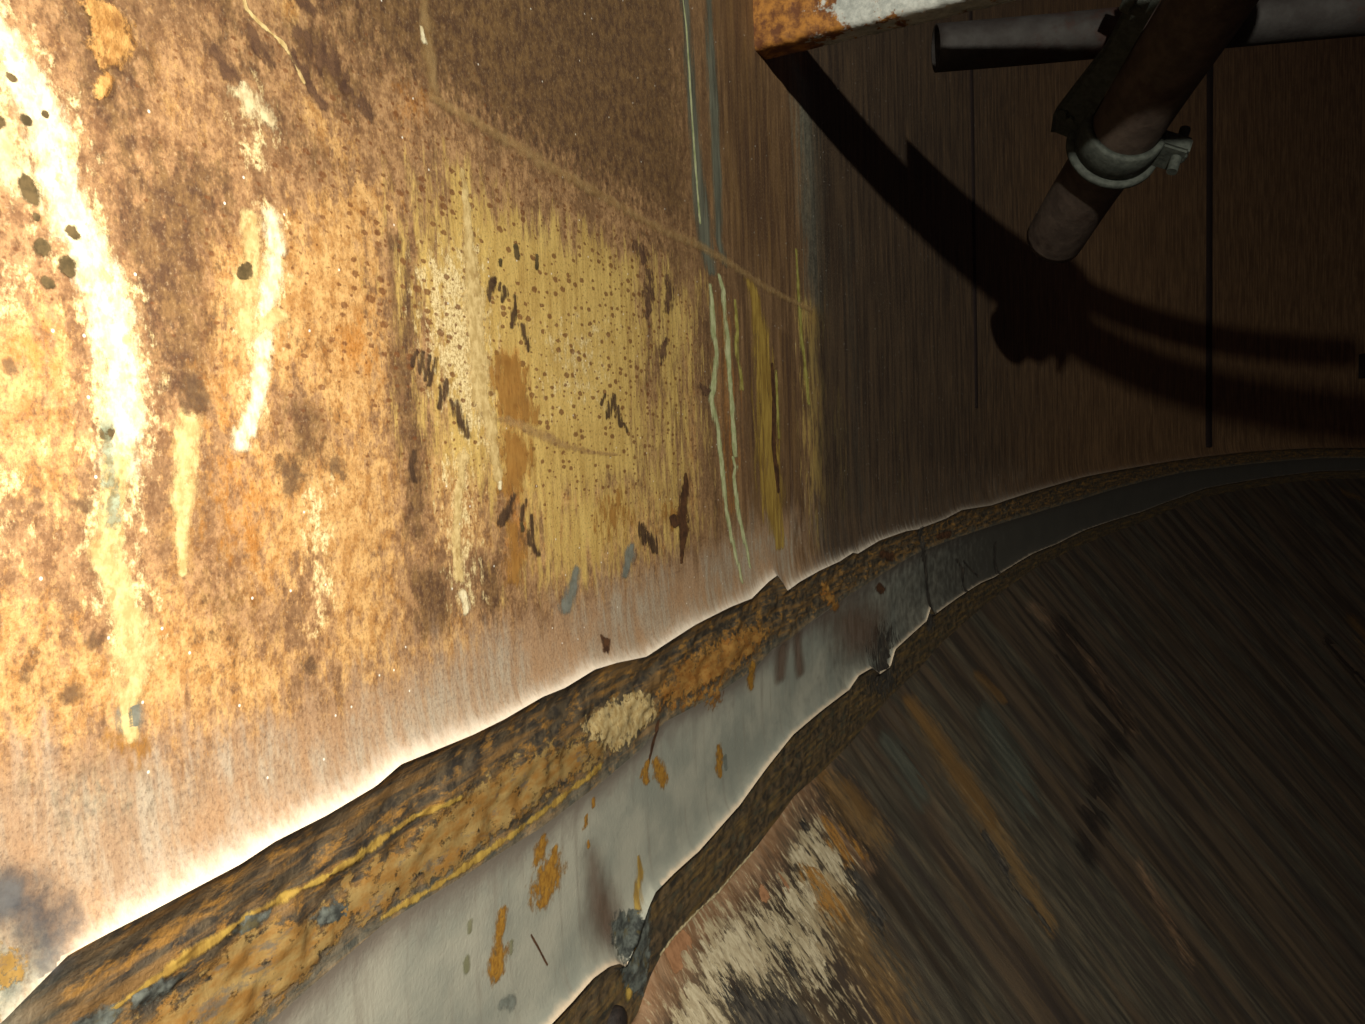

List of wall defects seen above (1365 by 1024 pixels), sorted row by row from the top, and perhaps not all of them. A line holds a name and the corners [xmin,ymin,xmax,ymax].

leakage [0,11,159,743]
leakage [229,207,288,451]
leakage [460,168,503,490]
leakage [680,0,784,584]
leakage [795,249,810,405]
leakage [452,451,470,615]
leakage [561,566,579,614]
leakage [623,544,635,578]
corrosion [106,620,770,1024]
corrosion [0,941,27,990]